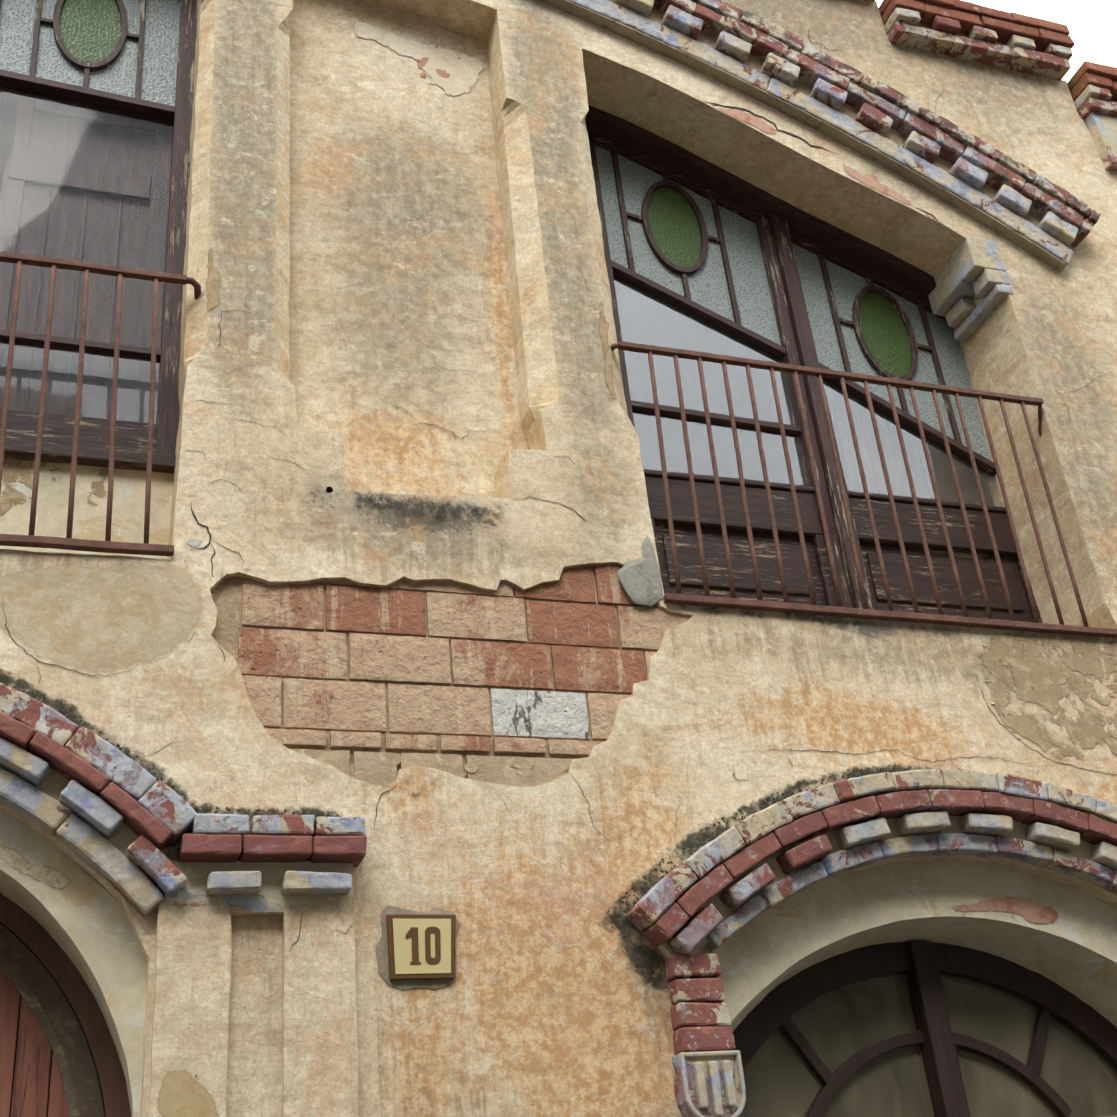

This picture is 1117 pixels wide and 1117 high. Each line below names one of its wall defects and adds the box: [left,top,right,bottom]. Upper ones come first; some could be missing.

crack [703,101,839,155]
crack [190,507,245,577]
water stain [356,494,500,522]
crack [3,598,139,685]
spalling [211,563,691,787]
crack [752,667,1117,776]
peeling [977,630,1117,762]
peeling [951,897,1058,924]
peeling [152,1067,218,1117]